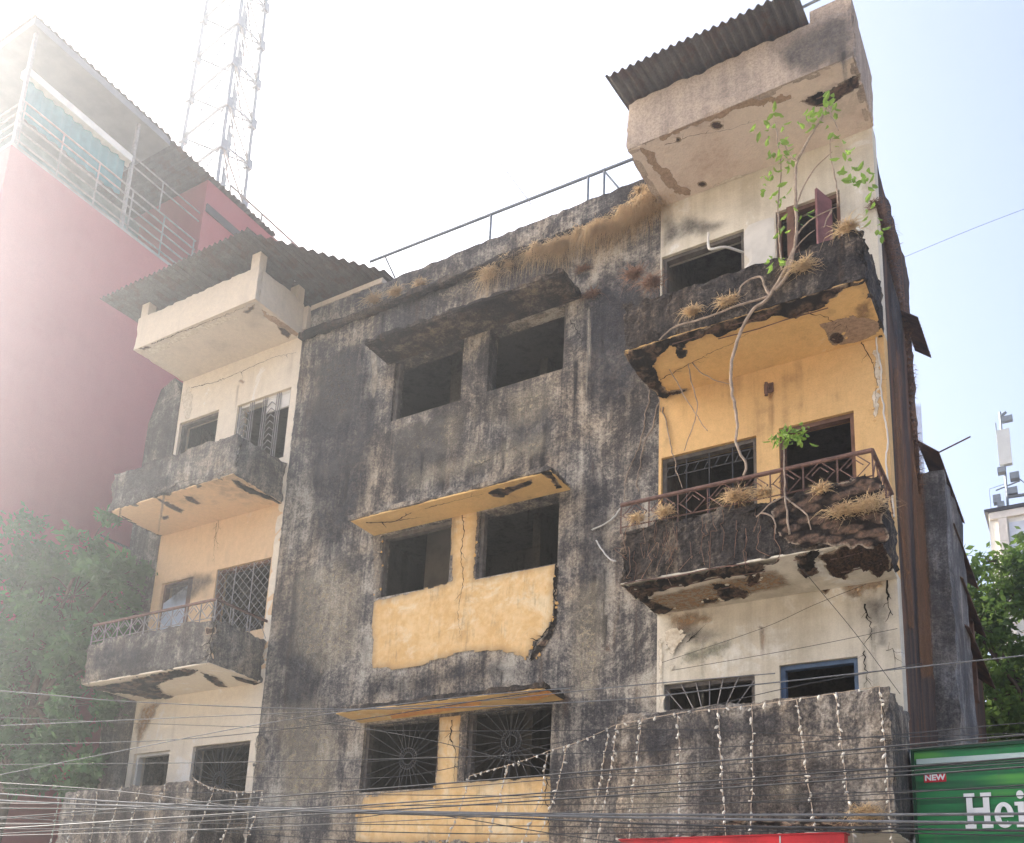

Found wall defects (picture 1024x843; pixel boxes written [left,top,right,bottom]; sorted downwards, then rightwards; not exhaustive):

spalling [659,73,862,142]
flaking render [639,148,748,197]
damp [574,273,641,409]
spalling [624,281,881,398]
damp [313,348,378,547]
spalling [488,470,562,499]
spalling [81,669,260,699]
crack [366,494,482,636]
spalling [524,566,559,661]
damp [582,480,607,644]
spalling [620,559,780,614]
crack [860,580,900,751]